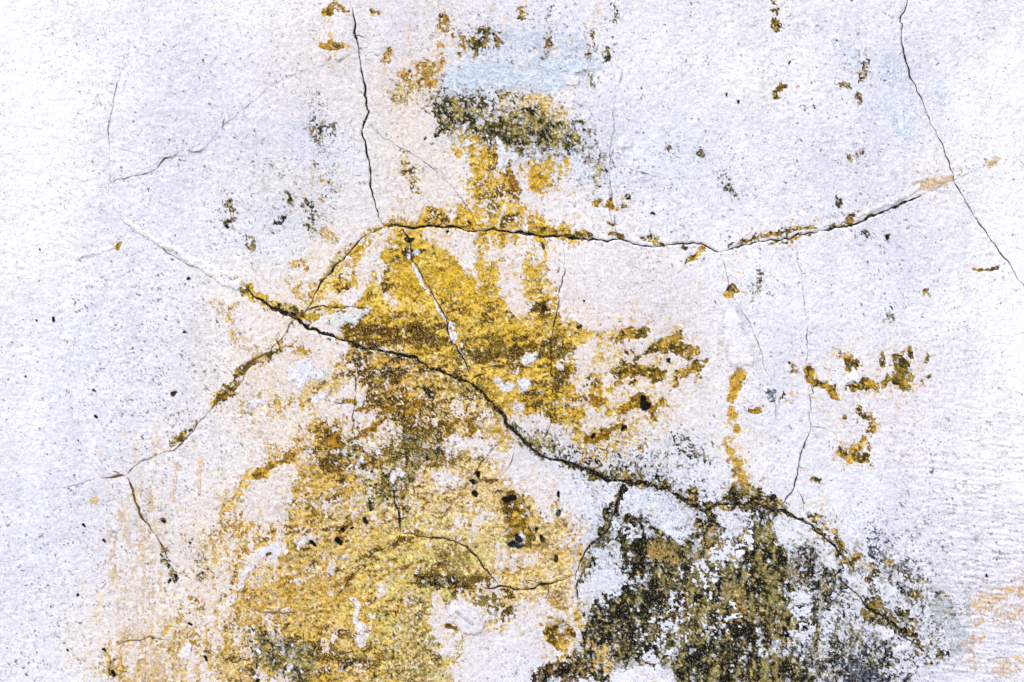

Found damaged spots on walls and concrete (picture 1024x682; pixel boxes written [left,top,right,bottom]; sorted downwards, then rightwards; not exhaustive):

crack [55,8,918,645]
water stain [422,2,620,200]
crack [825,184,942,231]
crack [900,0,1024,285]
water stain [512,392,971,682]